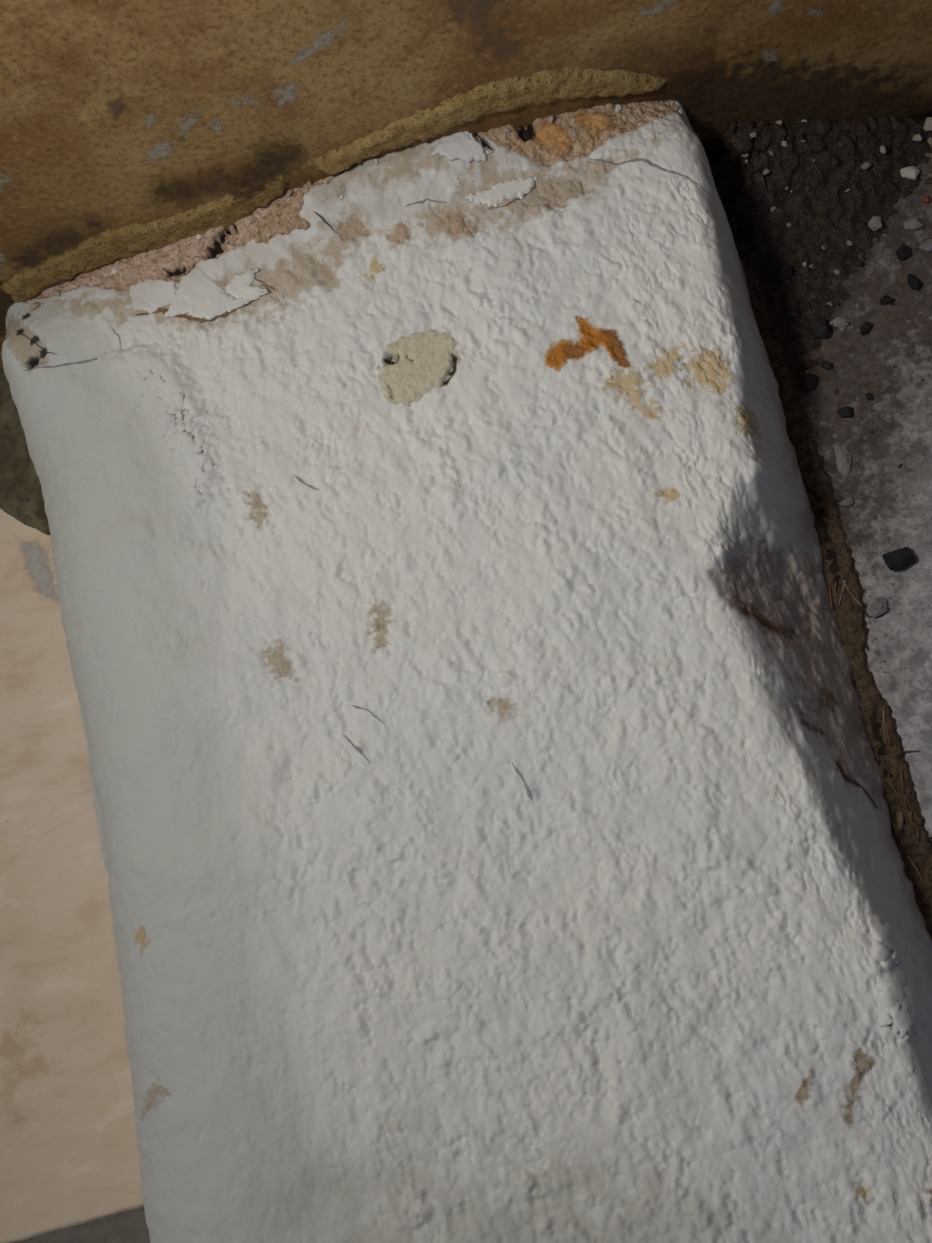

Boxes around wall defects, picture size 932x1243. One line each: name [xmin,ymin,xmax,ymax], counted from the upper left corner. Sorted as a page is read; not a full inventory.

leakage [150,144,305,206]
spalling [431,100,683,209]
flaking render [386,222,410,247]
flaking render [436,213,474,241]
spalling [6,166,353,371]
flaking render [365,258,385,281]
corrosion [545,316,733,419]